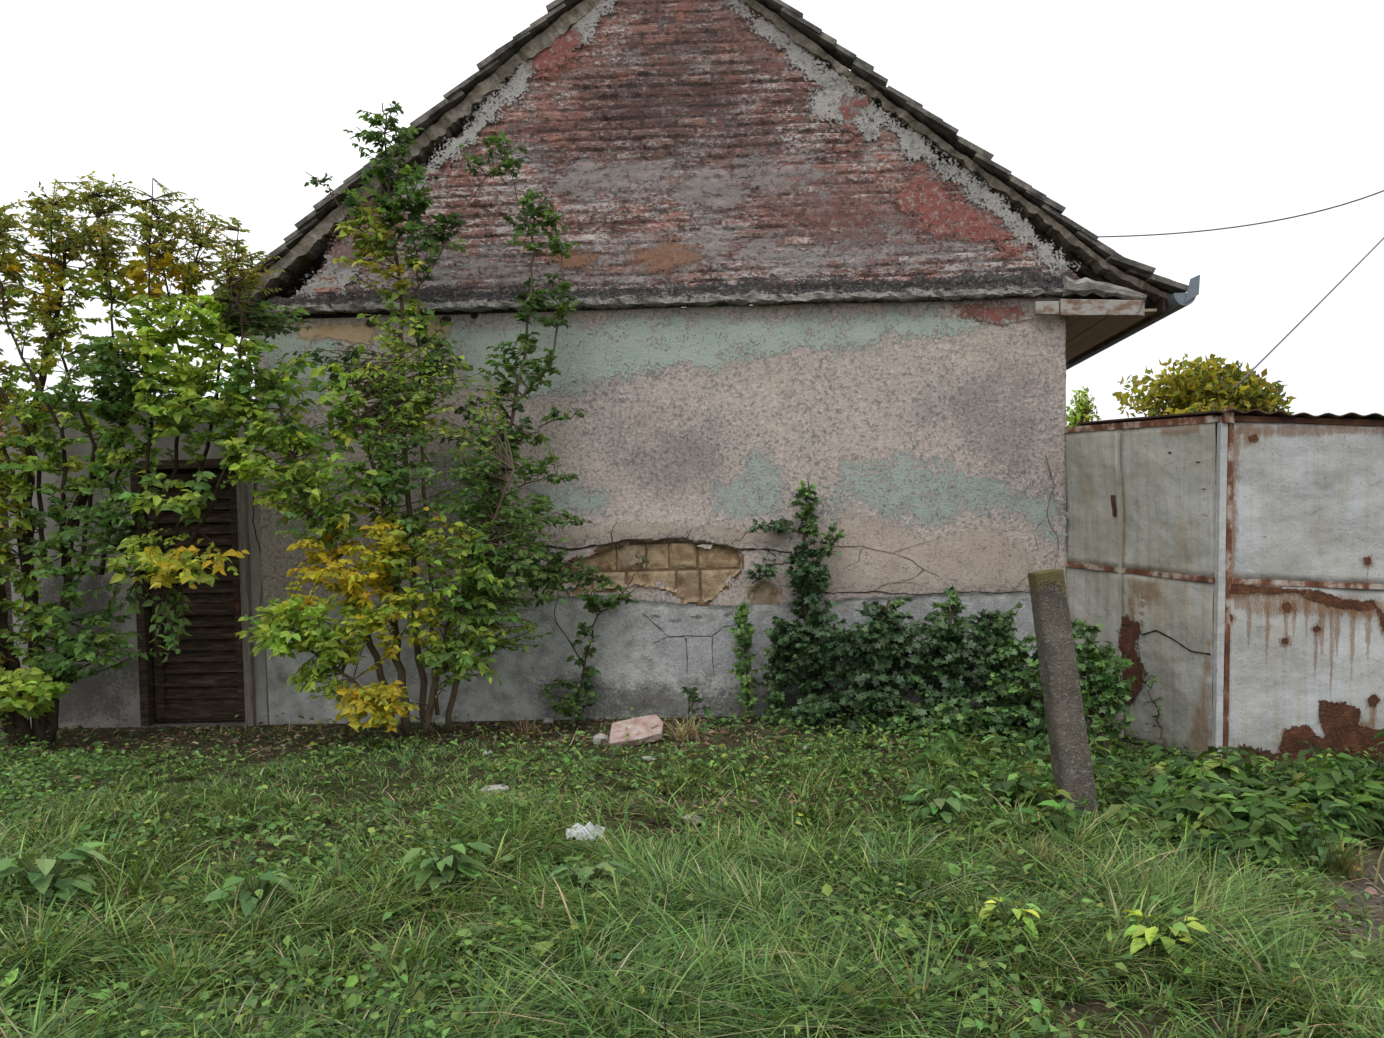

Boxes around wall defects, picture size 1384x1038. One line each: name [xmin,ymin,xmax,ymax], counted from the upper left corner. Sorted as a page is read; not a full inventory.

flaking render [291,0,619,299]
flaking render [719,0,1084,276]
flaking render [627,239,704,276]
flaking render [521,446,790,609]
crack [524,522,792,557]
crack [793,455,1059,595]
crack [643,614,736,675]
corrosion [1116,614,1148,706]
crack [1121,624,1211,656]
corrosion [1229,584,1384,631]
corrosion [1232,694,1384,770]